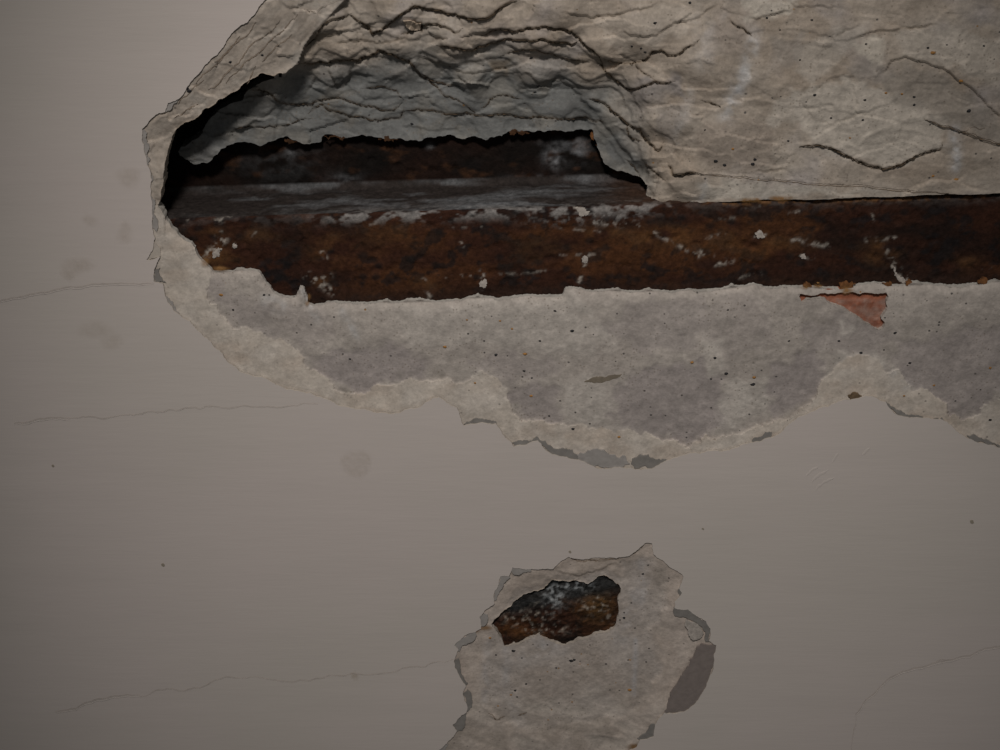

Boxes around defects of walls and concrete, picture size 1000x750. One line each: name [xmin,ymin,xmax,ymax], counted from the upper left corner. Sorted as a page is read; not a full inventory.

flaking render [142,0,1000,469]
rust [481,575,621,645]
flaking render [440,543,716,750]